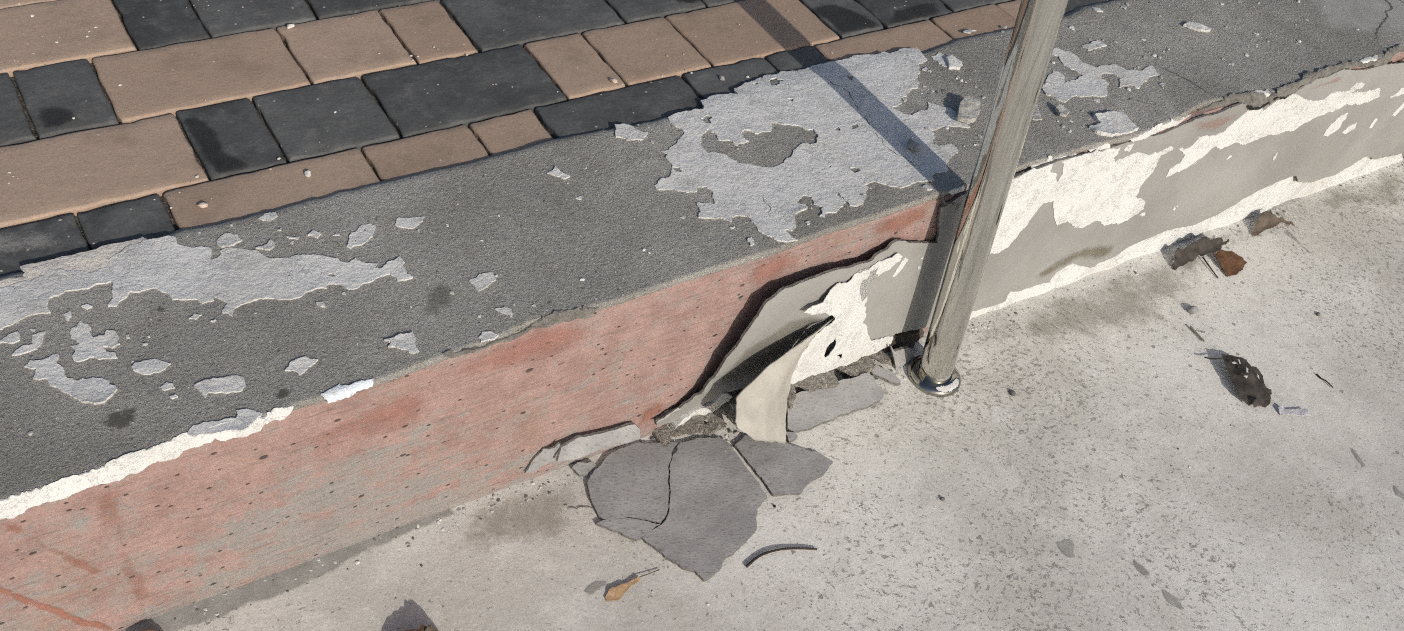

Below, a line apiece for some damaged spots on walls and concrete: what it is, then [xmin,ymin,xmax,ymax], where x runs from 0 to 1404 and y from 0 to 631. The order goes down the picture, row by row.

crack [1376,0,1404,64]
peeling [614,48,970,246]
peeling [990,40,1404,254]
crack [1246,85,1304,110]
peeling [0,212,413,428]
peeling [384,332,419,354]
peeling [395,216,425,233]
peeling [469,272,496,292]
spalling [442,304,599,358]
peeling [0,390,294,520]
spalling [524,253,924,582]
peeling [120,509,452,631]